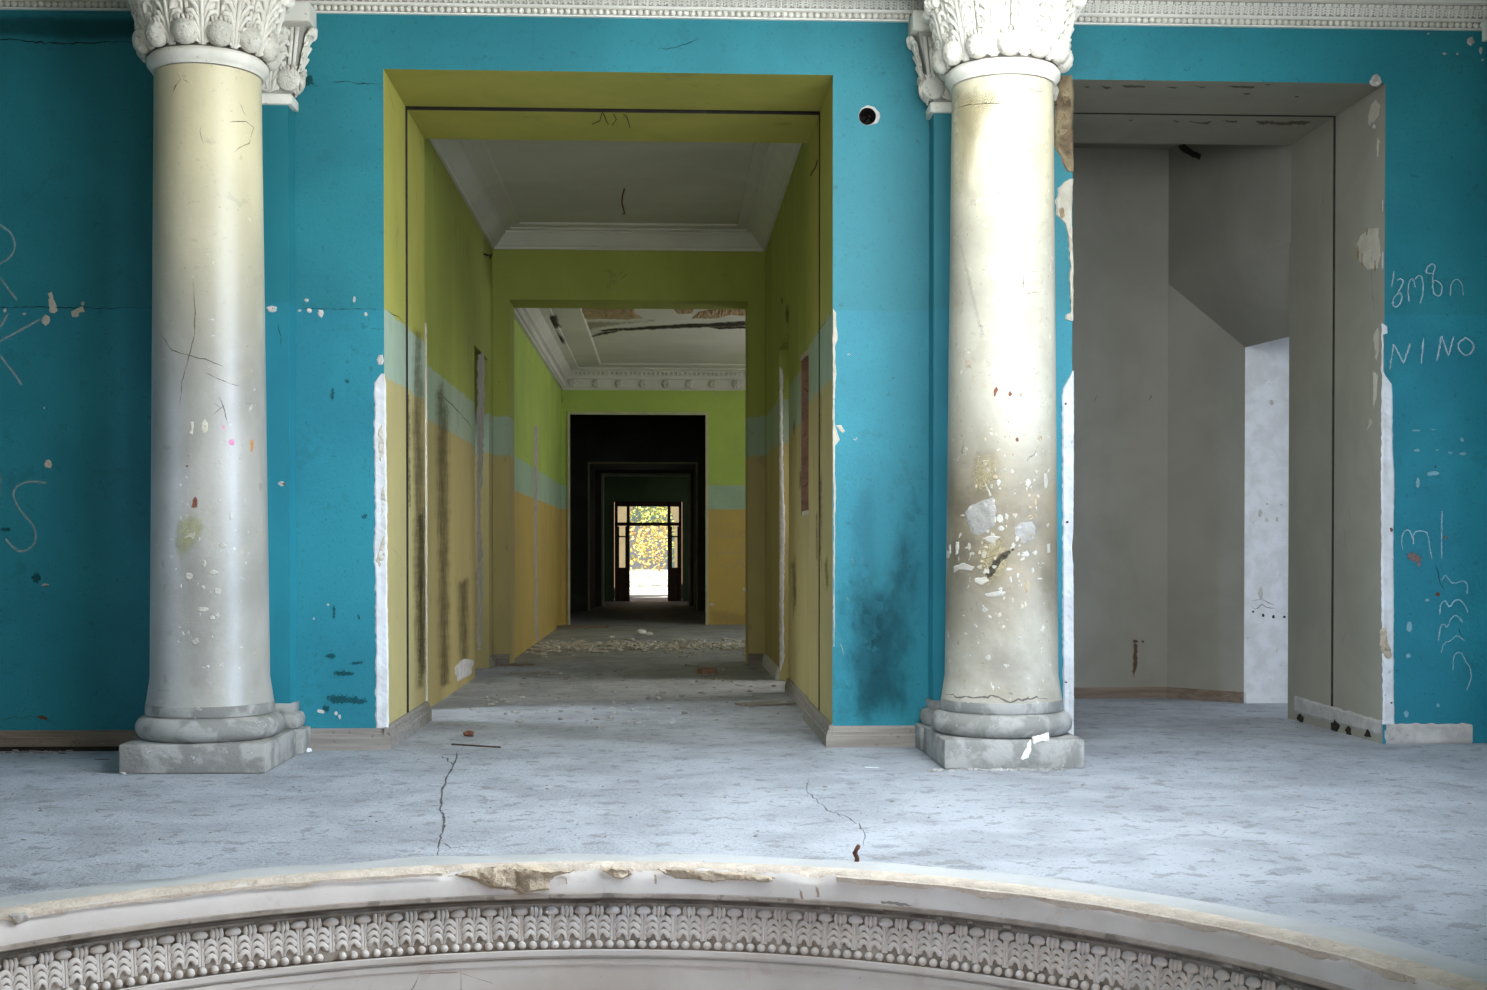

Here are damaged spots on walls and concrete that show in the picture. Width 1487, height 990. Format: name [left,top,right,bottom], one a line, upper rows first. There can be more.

peeling [674,309,745,319]
flaking render [946,371,1074,735]
crack [437,751,465,855]
crack [806,781,866,848]
flaking render [0,863,575,925]